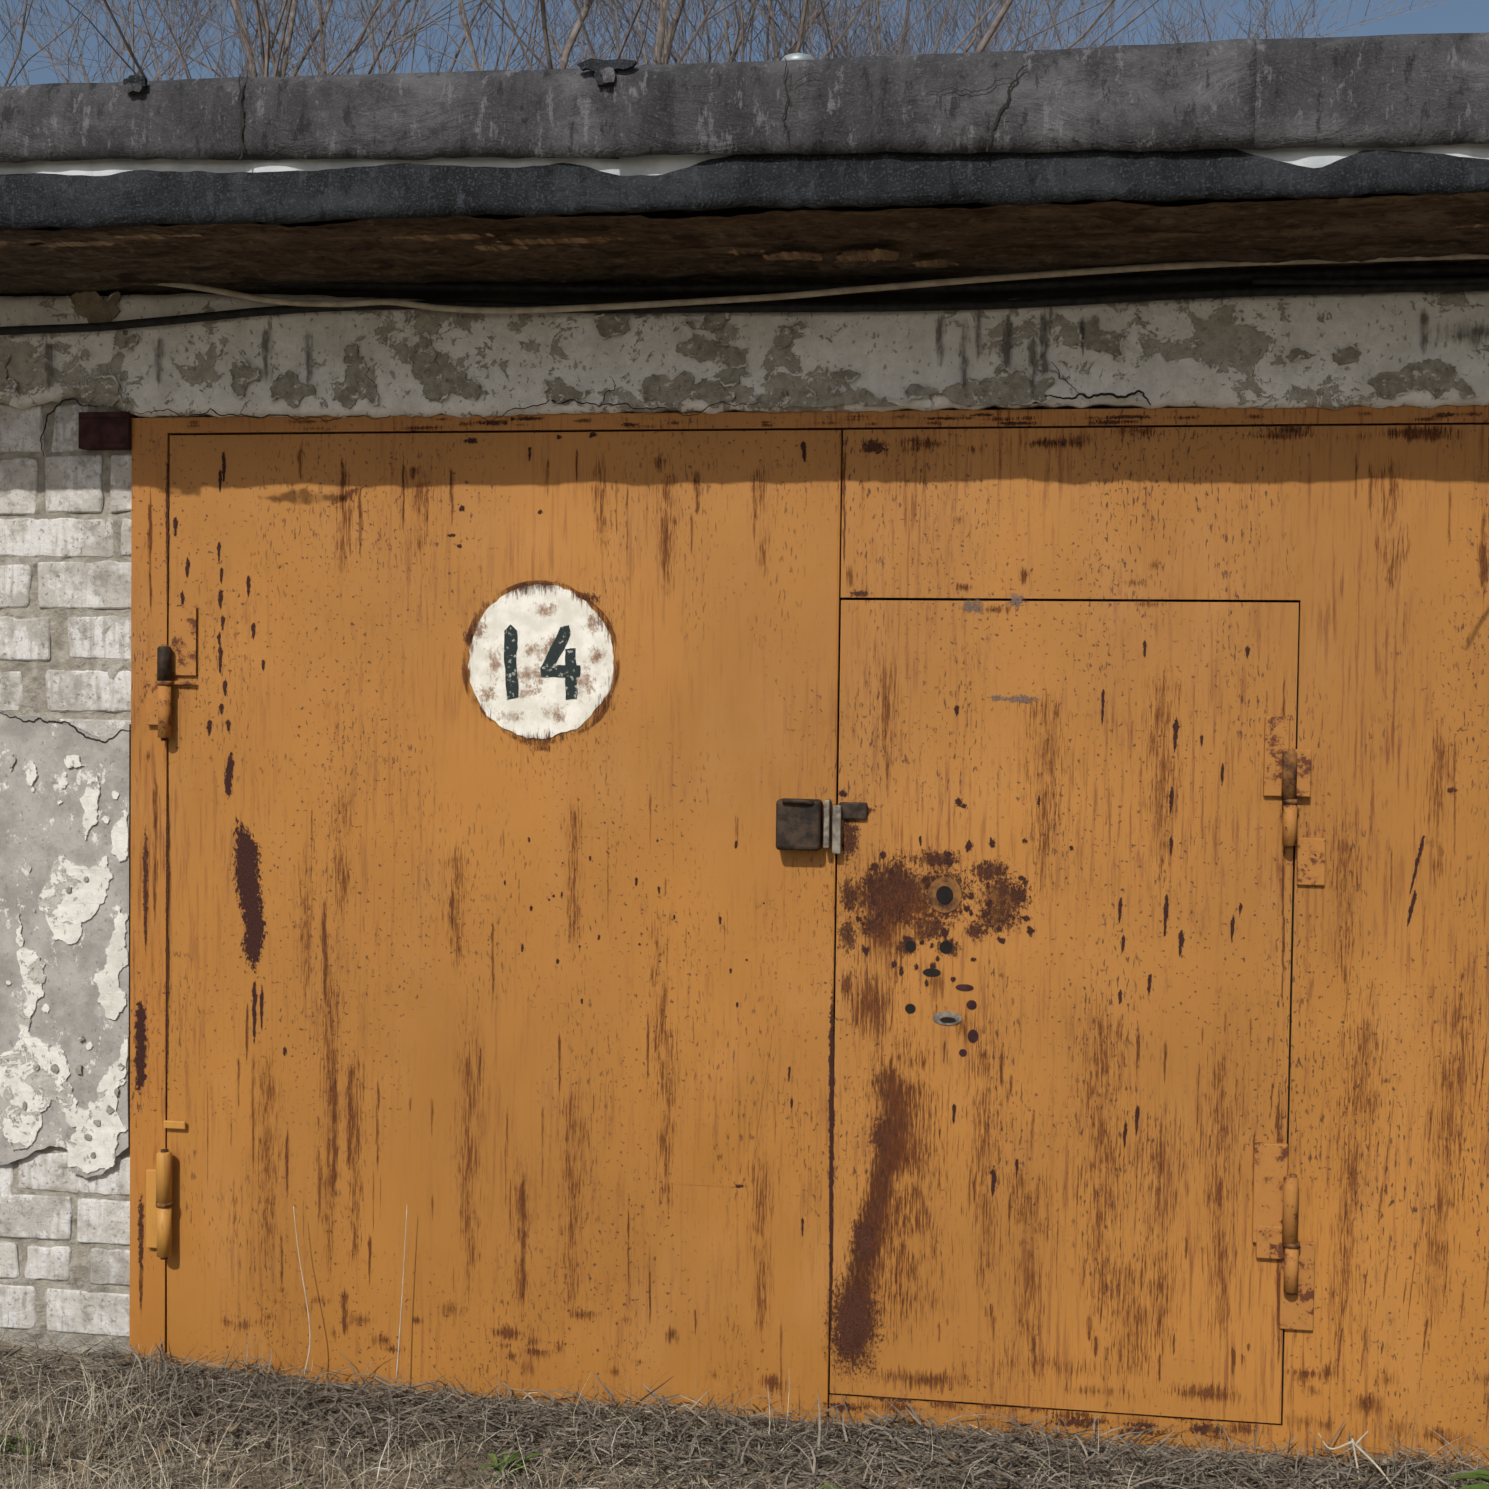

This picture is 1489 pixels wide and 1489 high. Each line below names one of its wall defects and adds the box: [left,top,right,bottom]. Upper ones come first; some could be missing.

peeling [228,341,379,410]
peeling [408,335,489,402]
peeling [639,313,752,409]
peeling [1368,358,1478,400]
crack [0,712,131,743]
rust [206,542,231,736]
rust [224,751,235,799]
flaking render [0,712,131,1178]
rust [229,817,289,1292]
rust [298,856,380,1277]
rust [818,665,1269,1440]
rust [1332,974,1487,1364]